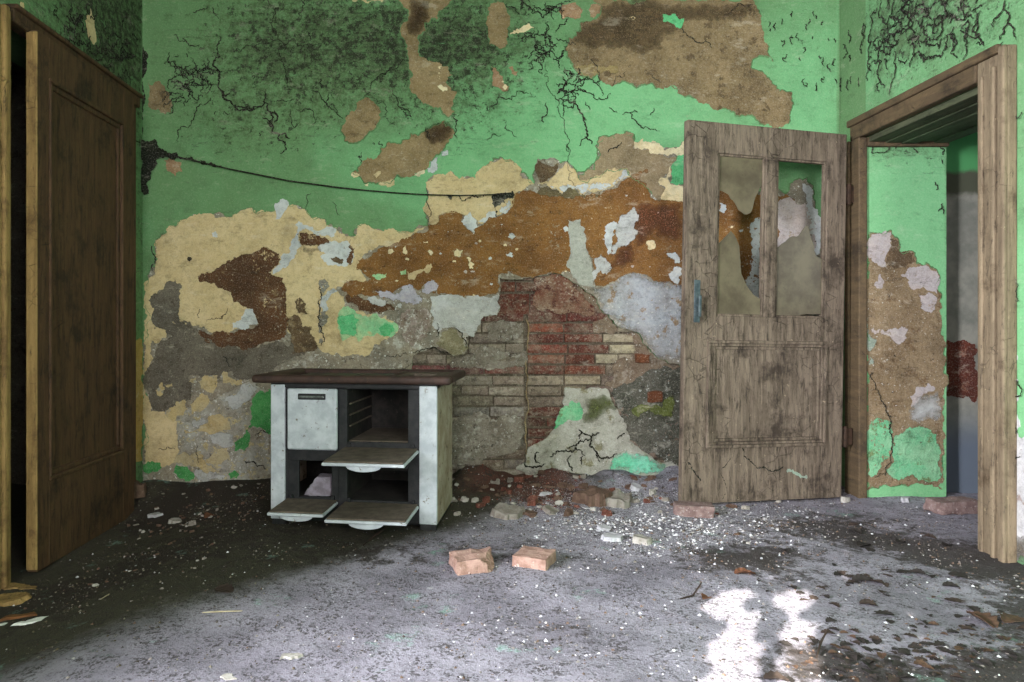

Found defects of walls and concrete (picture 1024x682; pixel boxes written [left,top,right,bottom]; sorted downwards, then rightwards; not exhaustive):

water stain [162,52,222,114]
crack [175,0,342,154]
crack [486,59,657,185]
peeling [559,0,794,128]
crack [866,0,1016,93]
peeling [136,0,684,483]
peeling [778,177,816,209]
peeling [867,230,978,490]
crack [870,373,893,477]